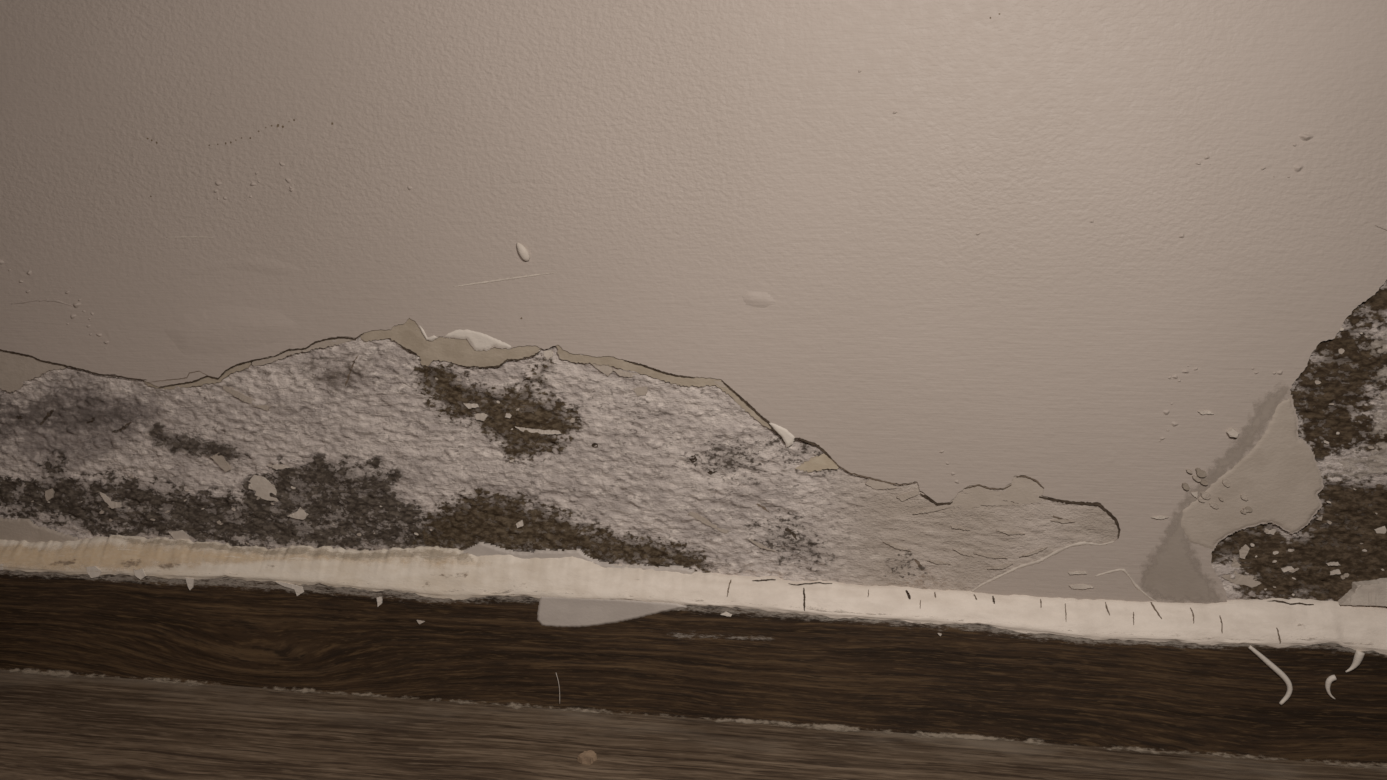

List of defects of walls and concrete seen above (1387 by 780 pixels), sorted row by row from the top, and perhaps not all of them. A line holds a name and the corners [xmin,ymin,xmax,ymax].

damp [149,422,249,461]
damp [0,451,714,573]
mould [414,355,583,467]
peeling [0,318,1119,591]
crack [624,360,1121,538]
peeling [1142,304,1387,603]
damp [1211,285,1387,601]